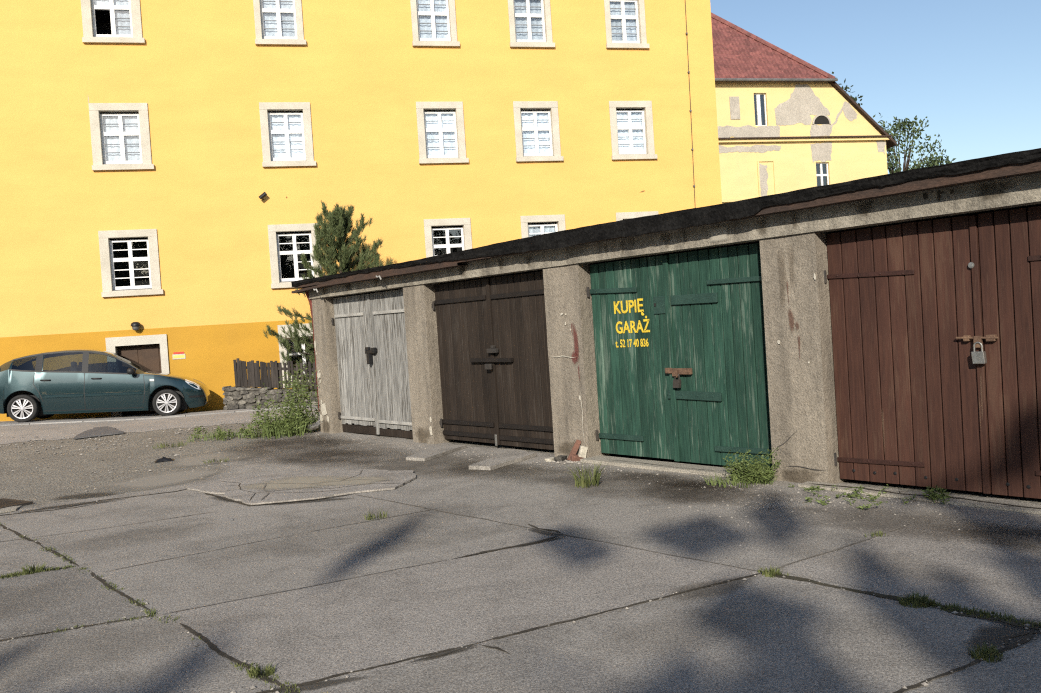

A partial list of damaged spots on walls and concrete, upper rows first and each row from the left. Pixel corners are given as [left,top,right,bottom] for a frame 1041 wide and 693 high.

flaking render [718,84,858,196]
corrosion [571,325,579,374]
crack [213,470,380,500]